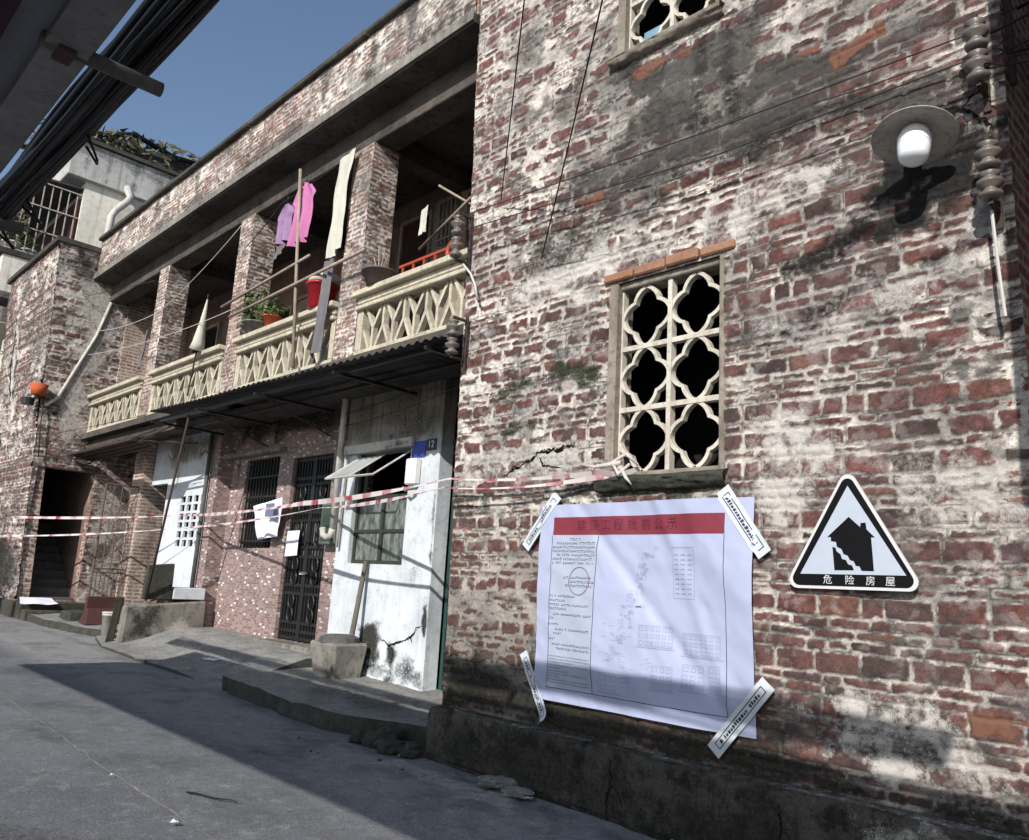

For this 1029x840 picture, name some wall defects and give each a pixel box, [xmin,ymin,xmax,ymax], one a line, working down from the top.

crack [503,442,575,476]
damp [359,623,420,686]
crack [380,626,421,663]